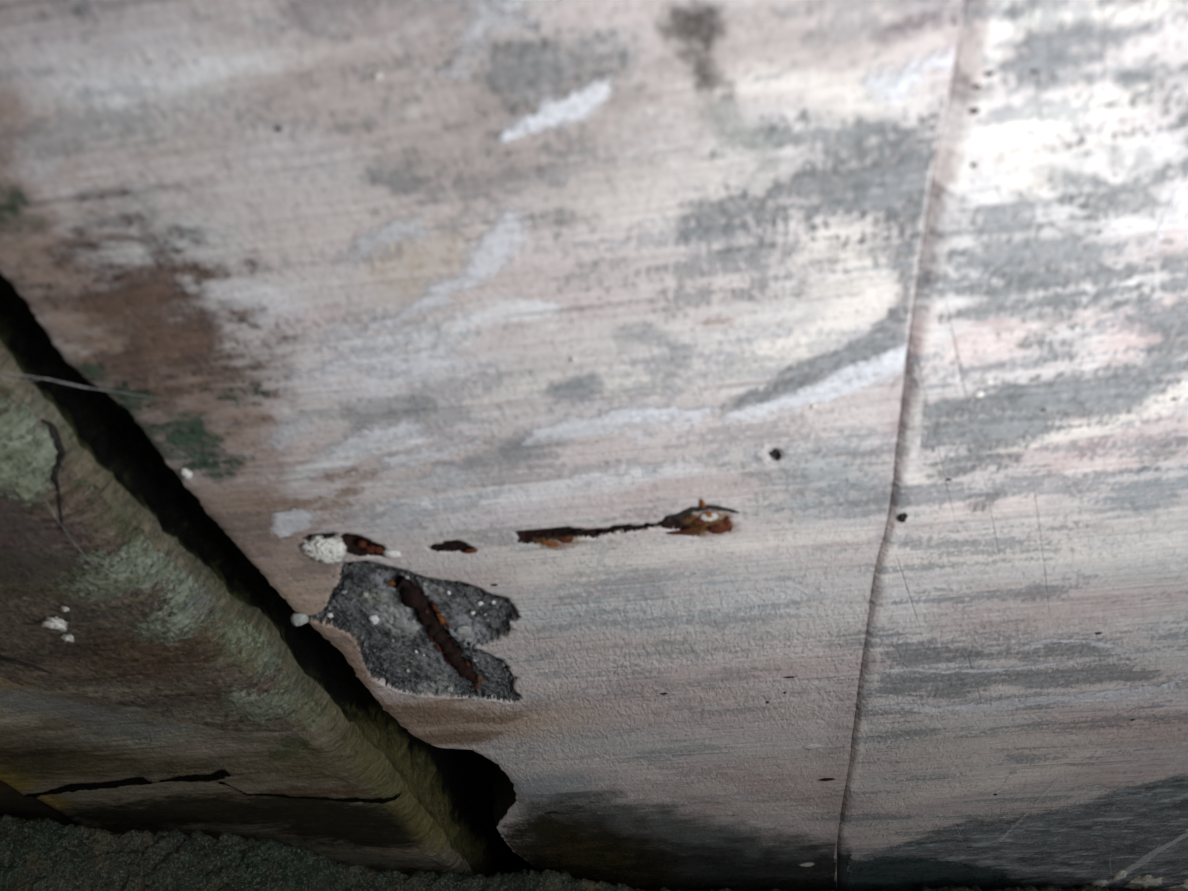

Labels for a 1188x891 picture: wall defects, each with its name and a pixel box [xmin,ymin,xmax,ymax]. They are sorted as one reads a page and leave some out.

damp [31,215,461,413]
corrosion [340,533,386,557]
corrosion [429,540,478,554]
spalling [308,561,524,703]
crack [22,770,401,804]